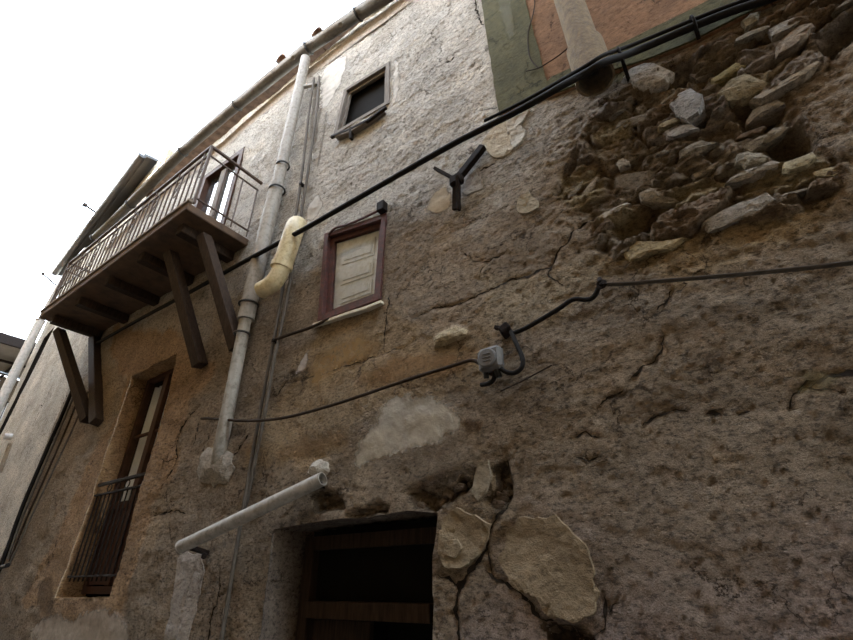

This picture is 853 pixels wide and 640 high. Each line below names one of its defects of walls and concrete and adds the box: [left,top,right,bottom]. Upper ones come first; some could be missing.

spalling [557,0,853,262]
crack [437,496,554,640]
crack [593,596,616,638]